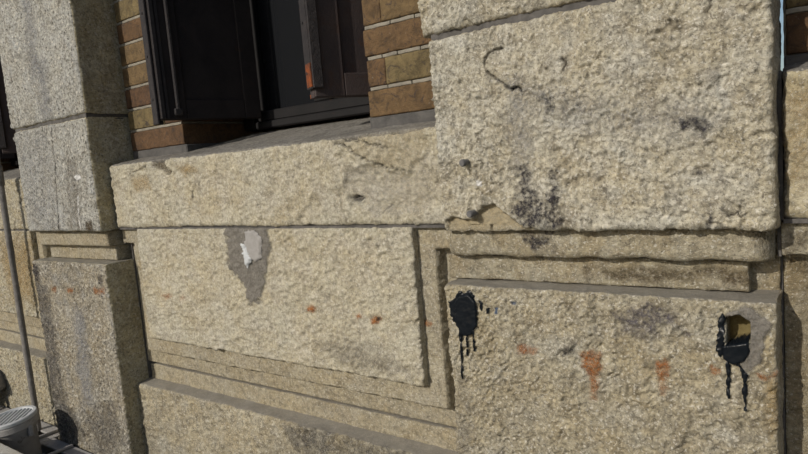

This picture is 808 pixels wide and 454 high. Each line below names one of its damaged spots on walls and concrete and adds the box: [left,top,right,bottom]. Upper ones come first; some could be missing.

peeling [240,230,262,268]
water stain [511,166,563,249]